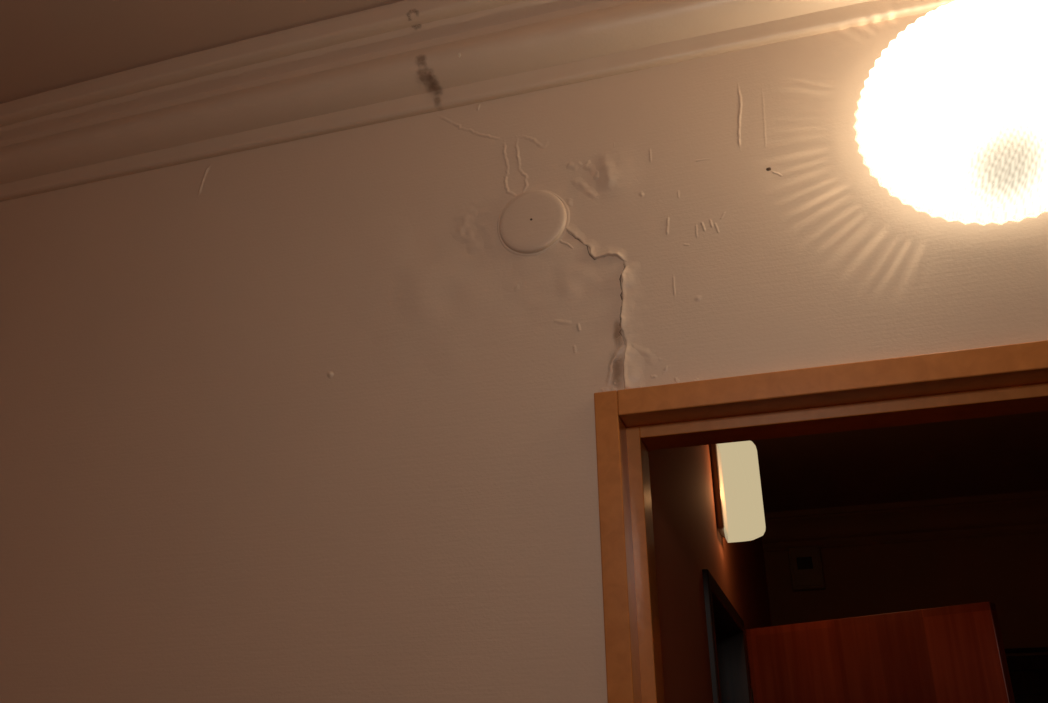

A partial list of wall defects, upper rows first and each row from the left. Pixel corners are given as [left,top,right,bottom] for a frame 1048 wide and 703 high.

peeling [559,223,700,392]